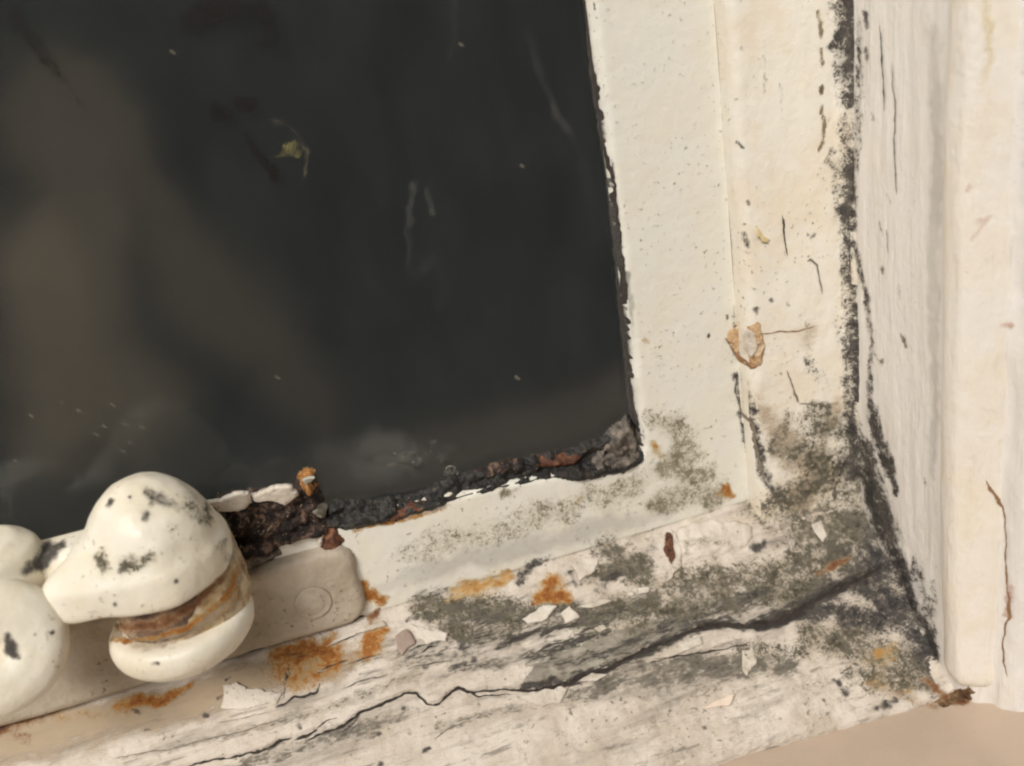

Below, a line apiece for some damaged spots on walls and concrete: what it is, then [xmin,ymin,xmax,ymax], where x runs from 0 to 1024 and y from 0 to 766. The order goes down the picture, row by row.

water stain [398,0,942,711]
spalling [725,322,765,369]
corrosion [446,569,514,601]
corrosion [531,573,573,606]
peeling [522,599,612,624]
corrosion [268,580,390,693]
peeling [412,624,447,644]
crack [114,566,882,766]
spalling [517,611,708,706]
peeling [742,646,757,675]
corrosion [113,682,192,713]
peeling [221,682,283,710]